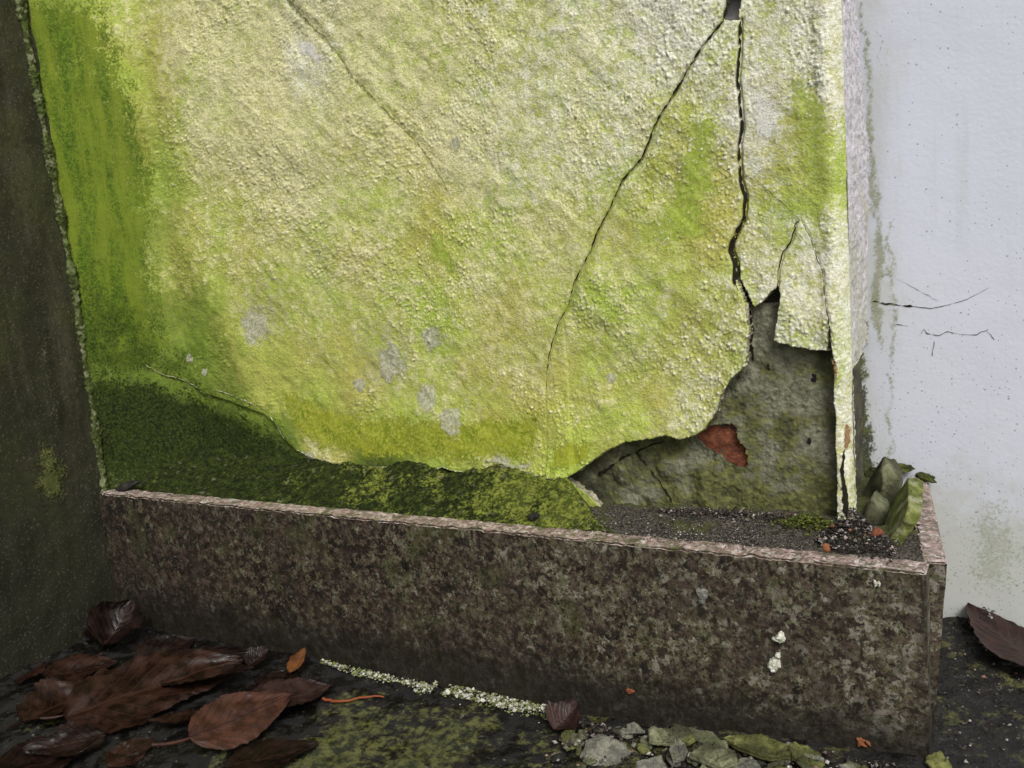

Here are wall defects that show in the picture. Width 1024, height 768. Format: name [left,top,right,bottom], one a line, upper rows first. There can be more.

crack [546,2,832,400]
spalling [570,302,838,516]
crack [872,282,994,356]